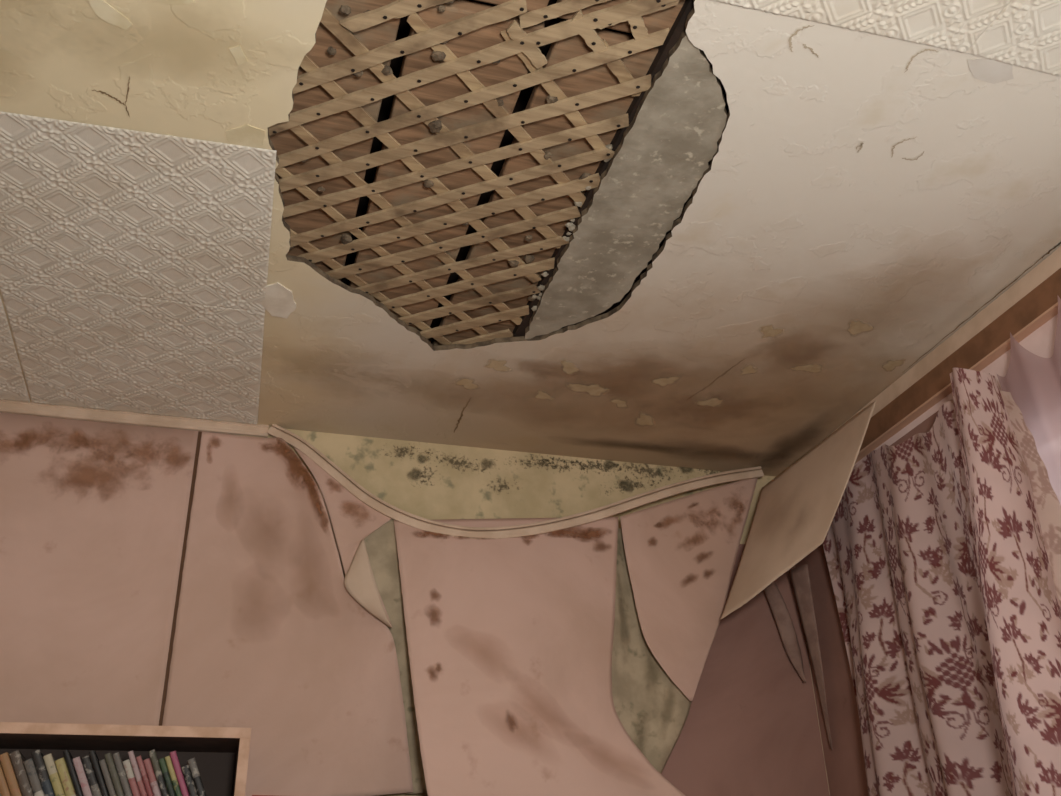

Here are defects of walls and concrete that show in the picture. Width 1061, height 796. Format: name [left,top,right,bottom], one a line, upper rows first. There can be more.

peeling [788,25,818,57]
crack [92,76,130,117]
water stain [385,446,492,485]
water stain [515,457,725,491]
peeling [789,564,833,751]